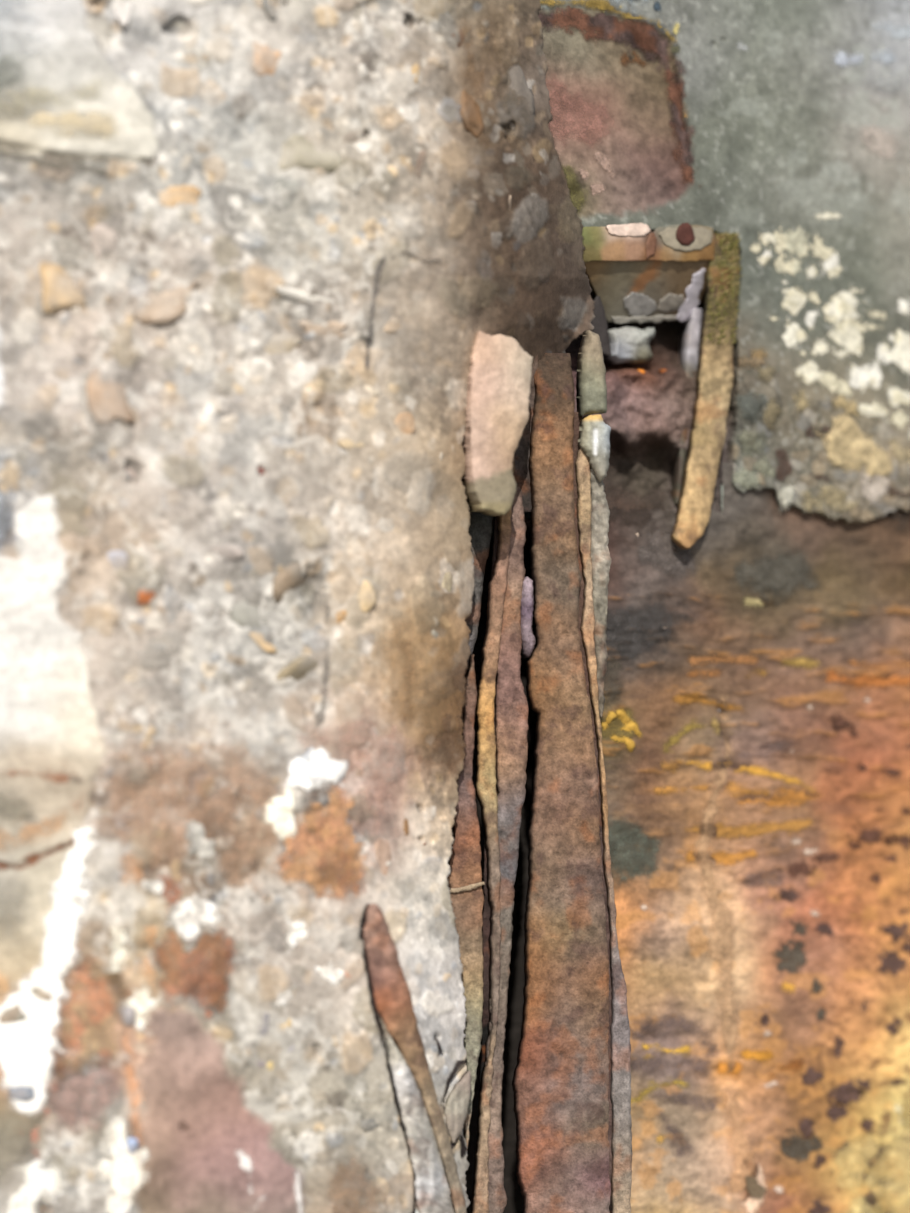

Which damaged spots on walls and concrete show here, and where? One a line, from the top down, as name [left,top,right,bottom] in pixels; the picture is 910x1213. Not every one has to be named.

corrosion [538,0,695,183]
corrosion [548,81,614,211]
corrosion [889,508,910,530]
spalling [0,0,706,1213]
corrosion [783,657,910,701]
corrosion [434,353,820,1213]
corrosion [279,786,365,898]
corrosion [160,875,180,906]
corrosion [145,926,233,1016]
crack [435,1037,466,1111]
crack [450,1136,467,1157]